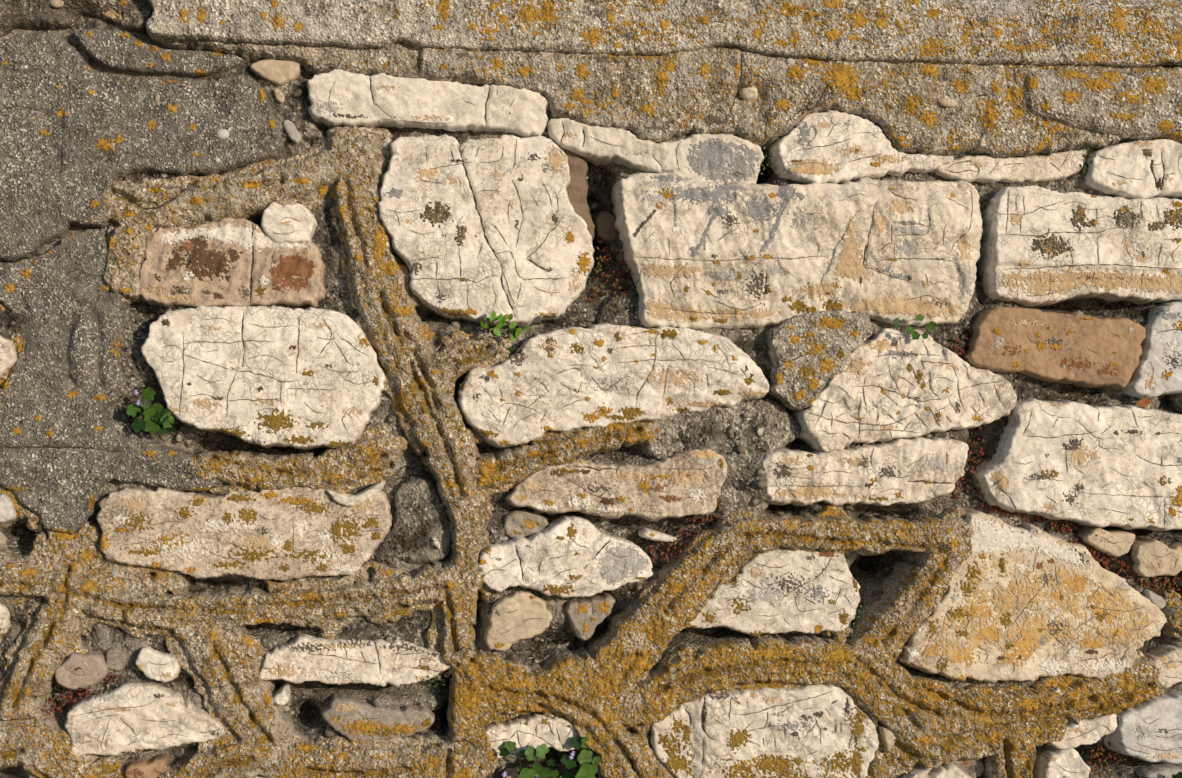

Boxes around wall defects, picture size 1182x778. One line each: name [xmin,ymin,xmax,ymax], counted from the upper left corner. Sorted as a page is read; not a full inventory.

crack [0,287,103,402]